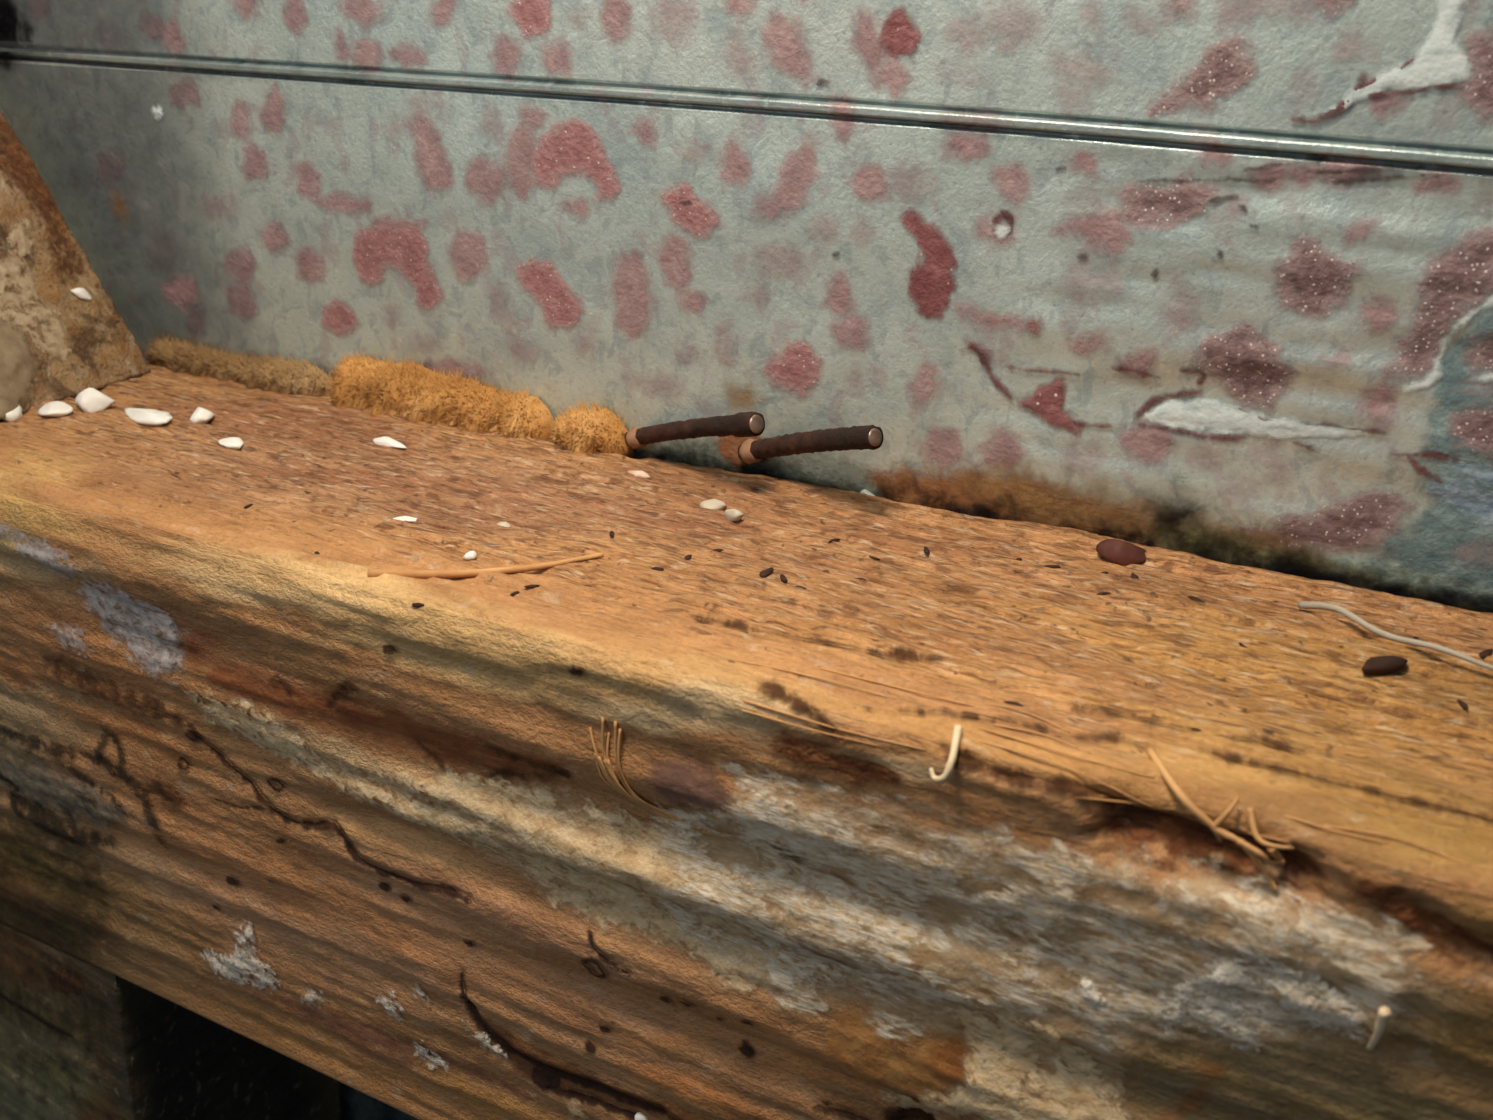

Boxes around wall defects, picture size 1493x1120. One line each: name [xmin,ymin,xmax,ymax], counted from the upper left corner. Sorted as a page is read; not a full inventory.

rust [719,435,760,467]
rust [872,469,1280,550]
leakage [1457,467,1493,480]
leakage [1157,506,1428,595]
leakage [0,725,186,852]